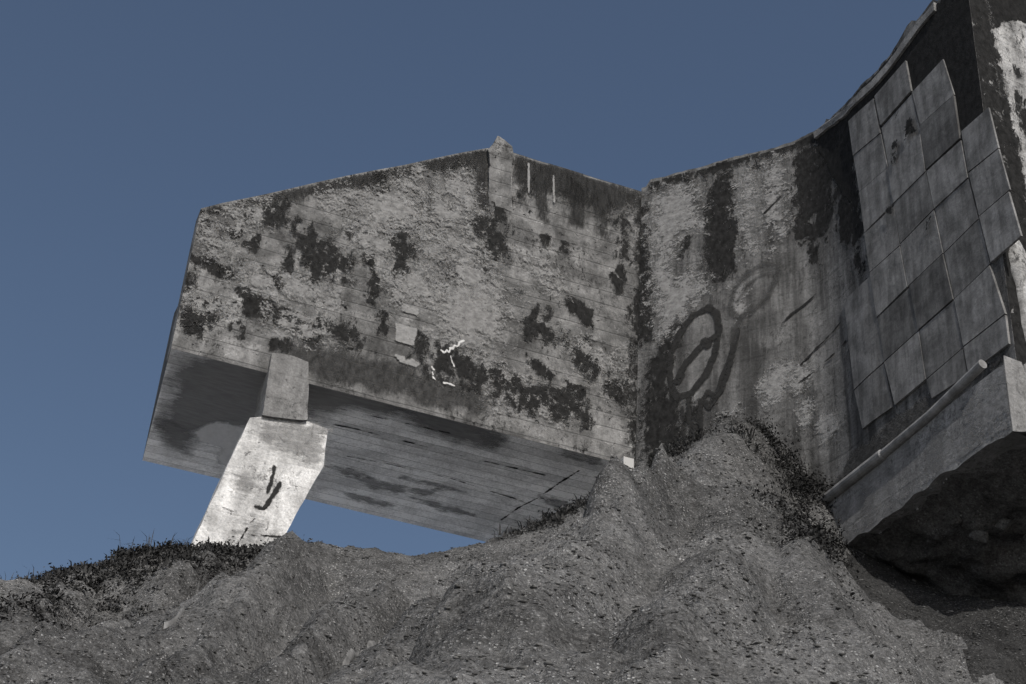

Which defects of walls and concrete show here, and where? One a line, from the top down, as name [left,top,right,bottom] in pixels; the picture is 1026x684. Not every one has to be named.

water stain [511,134,818,461]
water stain [156,341,505,464]
water stain [234,473,260,492]